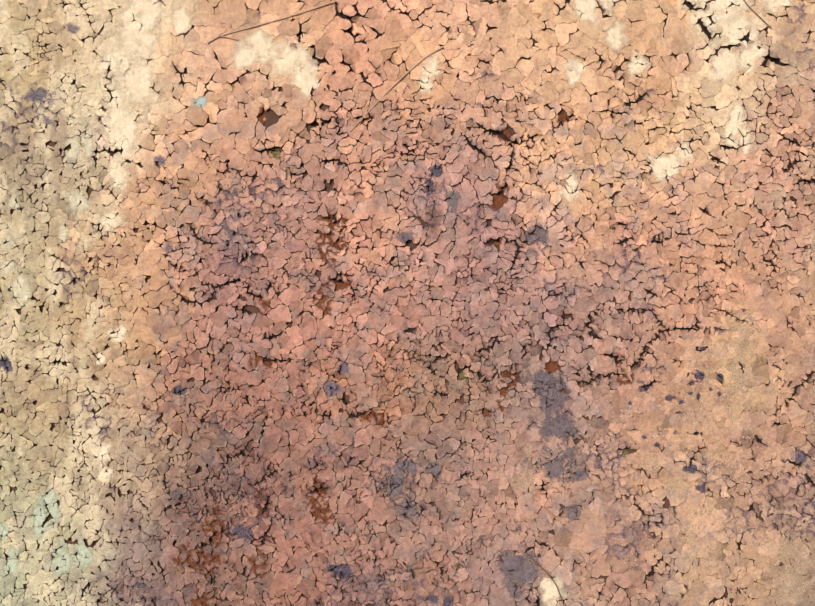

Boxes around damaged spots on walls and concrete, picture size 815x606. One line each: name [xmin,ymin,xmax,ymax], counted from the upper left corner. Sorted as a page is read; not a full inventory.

crack [299,24,371,85]
crack [335,3,382,38]
crack [684,1,750,49]
crack [762,55,787,66]
crack [93,144,123,164]
peeling [97,0,815,355]
crack [463,123,536,195]
crack [779,134,815,207]
crack [177,251,288,313]
crack [576,289,698,385]
peeling [178,180,815,573]
peeling [0,346,815,606]